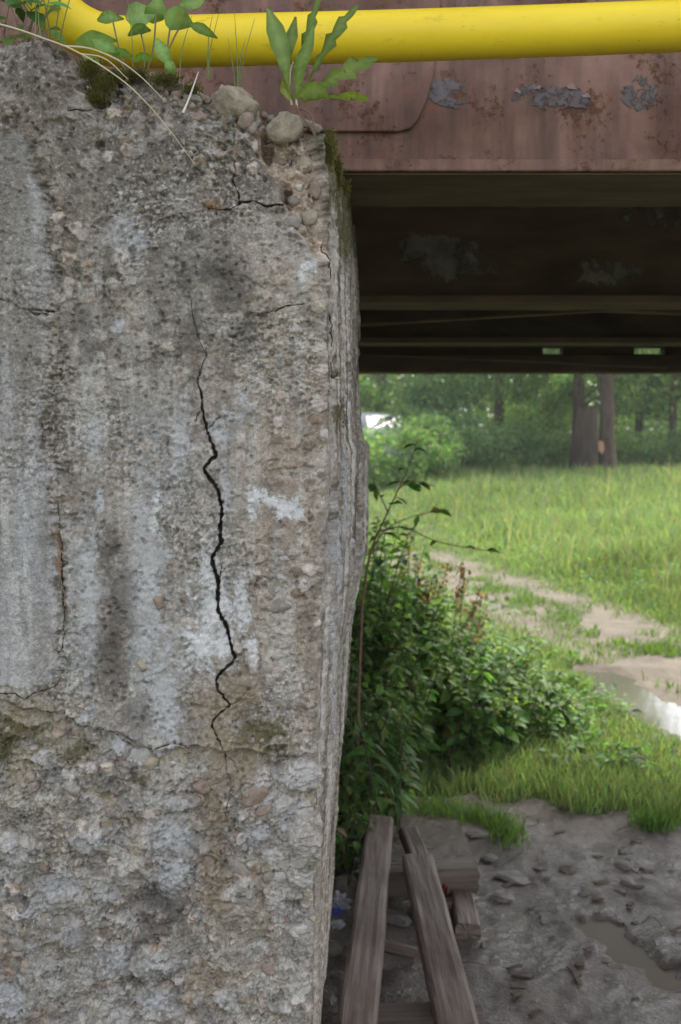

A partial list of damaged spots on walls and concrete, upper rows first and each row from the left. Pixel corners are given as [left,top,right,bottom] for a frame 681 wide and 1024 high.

peeling [428,78,467,109]
peeling [512,83,592,109]
peeling [621,75,658,111]
crack [133,162,282,248]
crack [0,501,65,700]
crack [191,303,244,832]